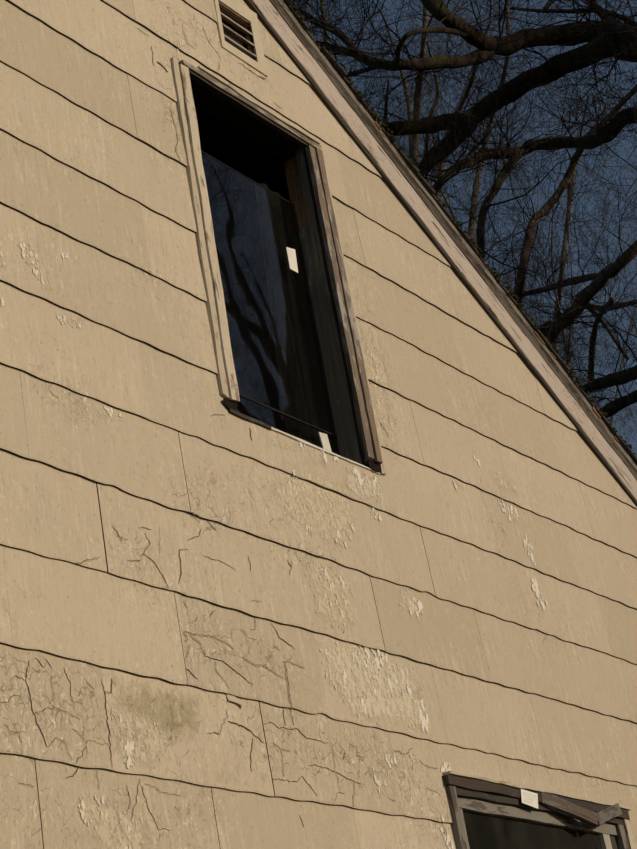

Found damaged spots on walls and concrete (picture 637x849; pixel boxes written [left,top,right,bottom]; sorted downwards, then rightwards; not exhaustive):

crack [113,511,251,608]
peeling [272,467,382,548]
peeling [301,559,357,633]
peeling [498,498,536,566]
crack [0,655,113,789]
crack [183,600,372,807]
peeling [320,641,428,734]
peeling [78,796,146,849]